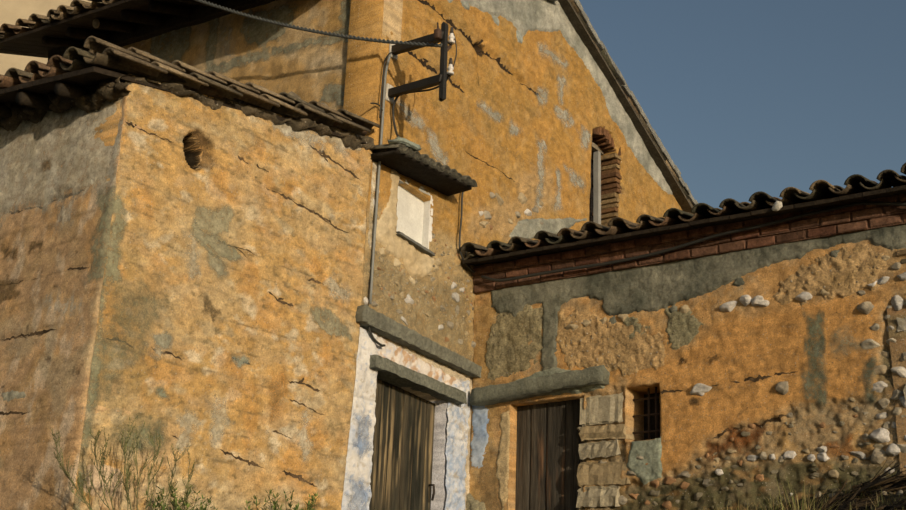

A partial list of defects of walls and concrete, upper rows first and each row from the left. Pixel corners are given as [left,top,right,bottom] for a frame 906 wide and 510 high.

crack [408,0,540,97]
crack [125,121,171,142]
spalling [182,129,213,170]
crack [269,292,293,306]
crack [2,329,56,341]
water stain [802,313,855,404]
crack [0,409,29,417]
crack [289,378,324,415]
crack [712,371,798,386]
crack [220,449,317,487]